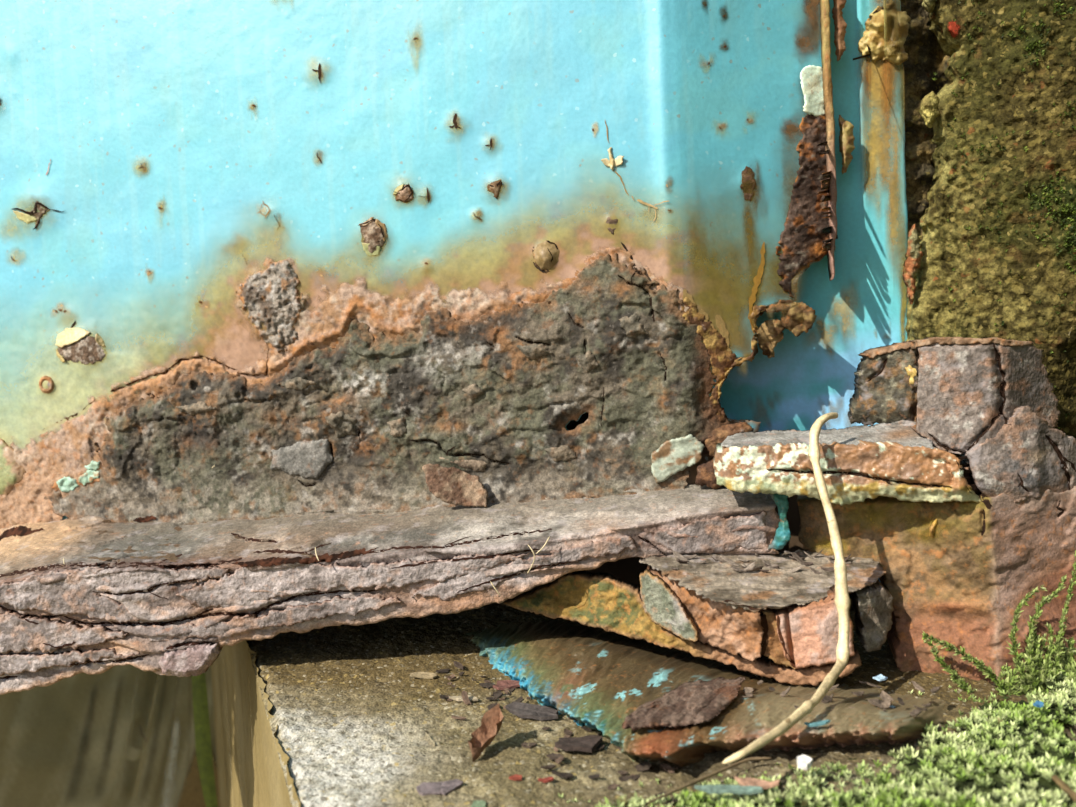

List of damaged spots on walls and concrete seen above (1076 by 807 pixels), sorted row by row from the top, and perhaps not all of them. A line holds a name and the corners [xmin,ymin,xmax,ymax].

peeling [0,247,732,529]
corrosion [0,0,907,525]
crack [403,408,511,464]
crack [0,528,582,665]